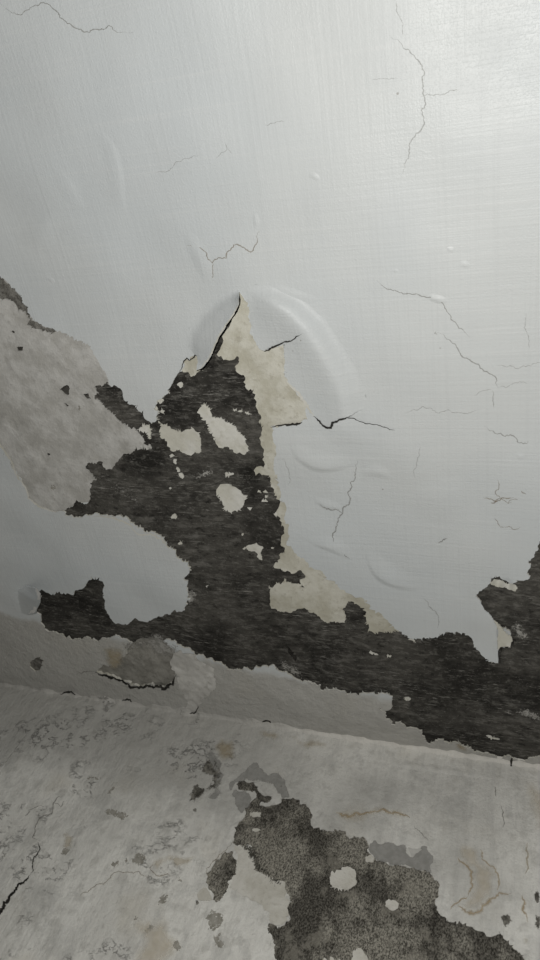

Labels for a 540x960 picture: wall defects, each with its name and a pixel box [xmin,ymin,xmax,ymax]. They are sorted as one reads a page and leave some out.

spalling [0,277,540,760]
crack [0,796,63,914]
peeling [205,910,224,948]
peeling [229,845,290,926]